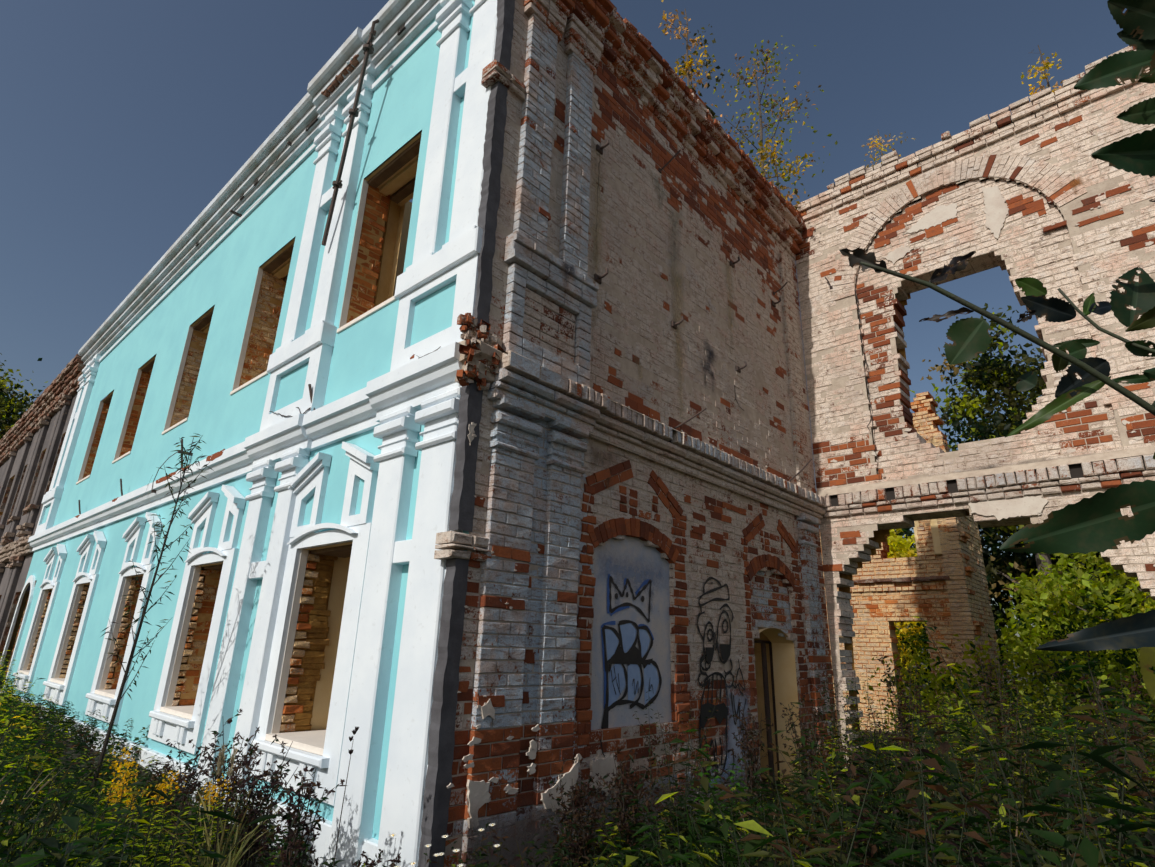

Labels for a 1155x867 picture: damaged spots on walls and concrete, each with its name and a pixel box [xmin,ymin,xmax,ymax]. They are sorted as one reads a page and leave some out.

flaking render [591,59,781,332]
spalling [874,184,959,275]
spalling [1006,184,1133,233]
spalling [455,313,504,391]
spalling [469,544,545,573]
spalling [840,530,862,545]
spalling [505,600,525,610]
spalling [523,652,536,664]
spalling [457,681,505,709]
flaking render [446,725,481,788]
flaking render [488,724,543,807]
flaking render [574,749,609,766]